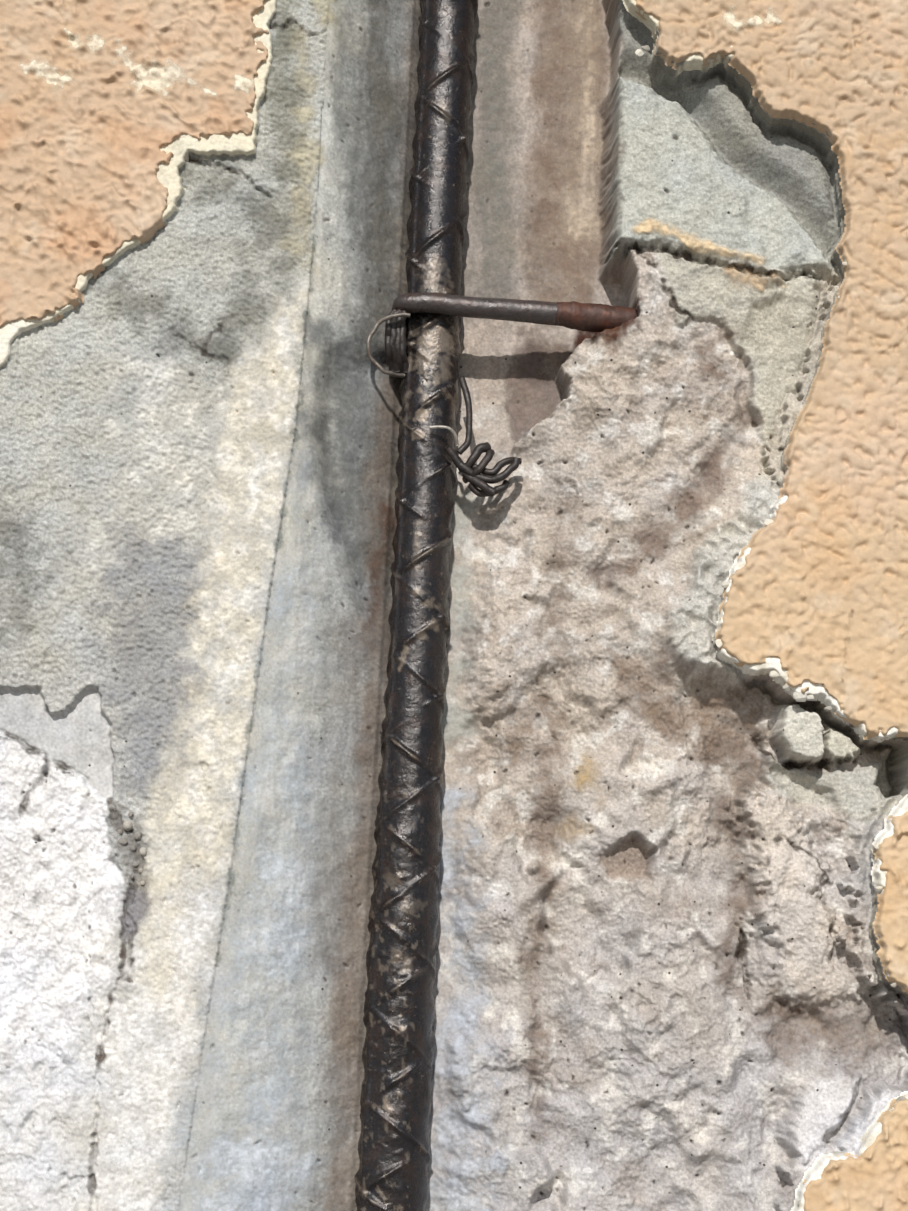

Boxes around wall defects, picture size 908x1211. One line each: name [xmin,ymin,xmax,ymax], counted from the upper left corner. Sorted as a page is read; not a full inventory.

rust [474,0,514,298]
rust [531,0,605,303]
rust [506,300,639,441]
crack [604,242,815,318]
peeling [0,0,330,1211]
spalling [444,0,908,1211]
crack [95,800,143,1066]
crack [71,1115,98,1195]